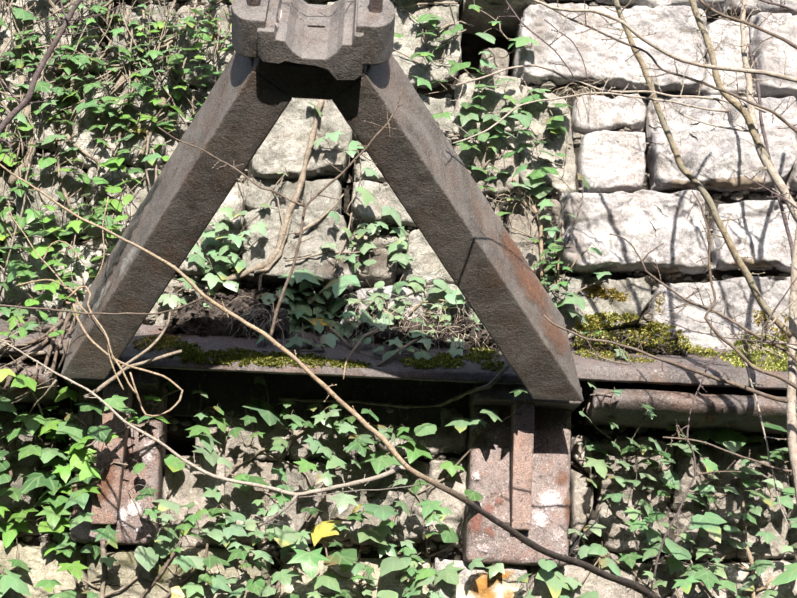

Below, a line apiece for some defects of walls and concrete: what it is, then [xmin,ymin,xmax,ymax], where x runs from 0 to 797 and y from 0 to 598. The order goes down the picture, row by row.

rust [503,231,546,306]
rust [95,468,113,500]
rust [470,499,502,535]
rust [471,571,513,598]